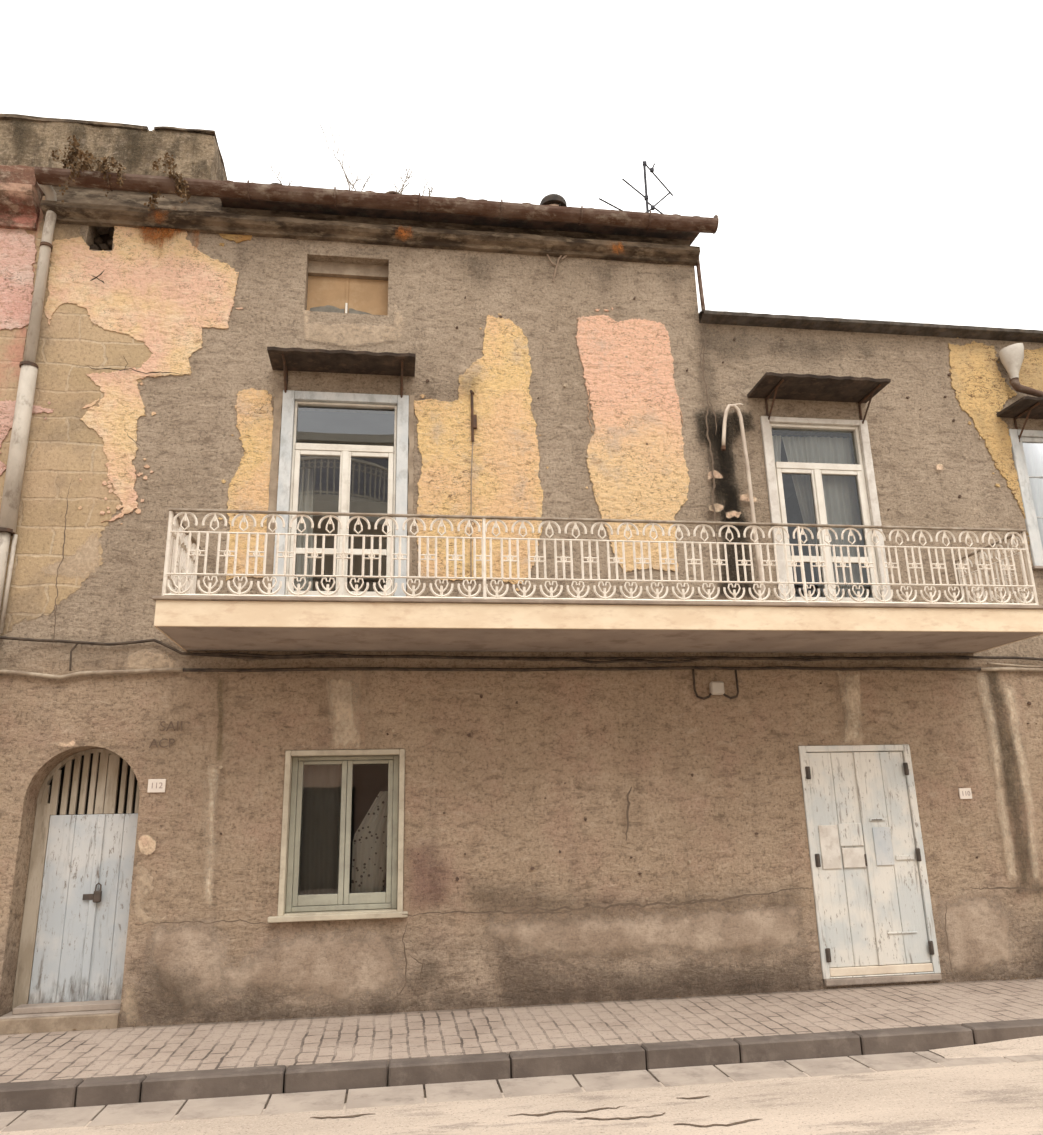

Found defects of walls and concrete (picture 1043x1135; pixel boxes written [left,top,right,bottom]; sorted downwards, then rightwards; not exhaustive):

flaking render [0,219,252,636]
peeling [218,388,278,581]
peeling [414,313,549,591]
peeling [575,308,690,573]
leakage [697,410,755,596]
peeling [944,337,1043,519]
crack [384,887,809,1003]